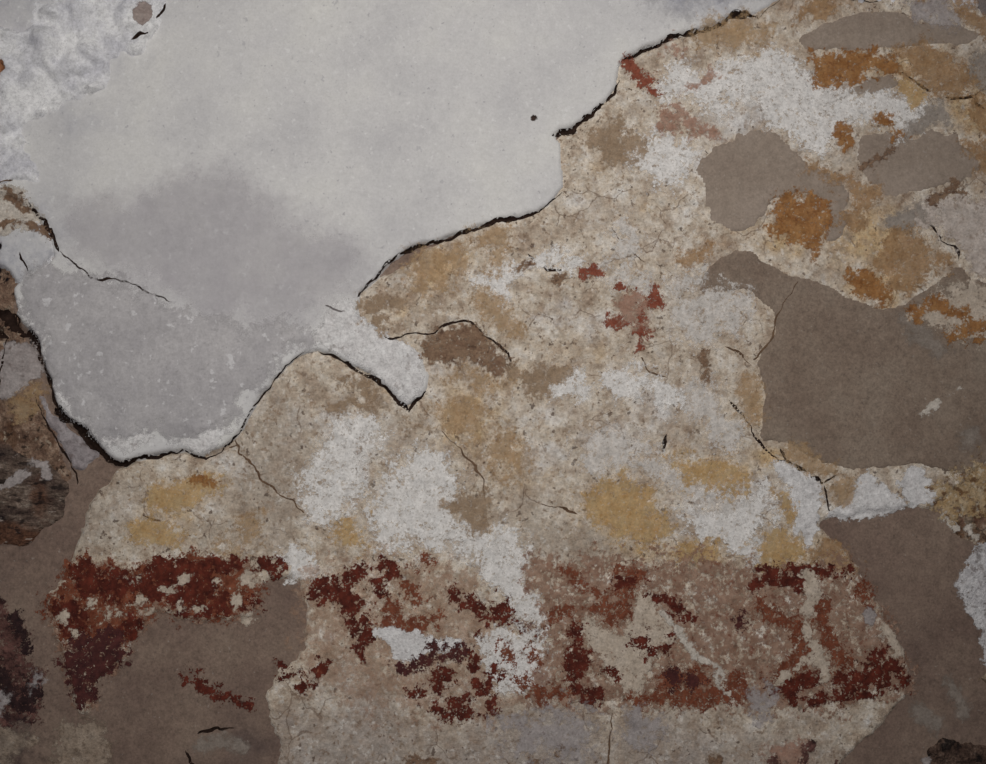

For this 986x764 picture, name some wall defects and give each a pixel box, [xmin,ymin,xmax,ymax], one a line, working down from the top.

peeling [132,1,152,25]
peeling [623,123,702,199]
peeling [650,42,941,171]
damp [904,98,953,139]
crack [28,201,169,302]
peeling [0,177,986,764]